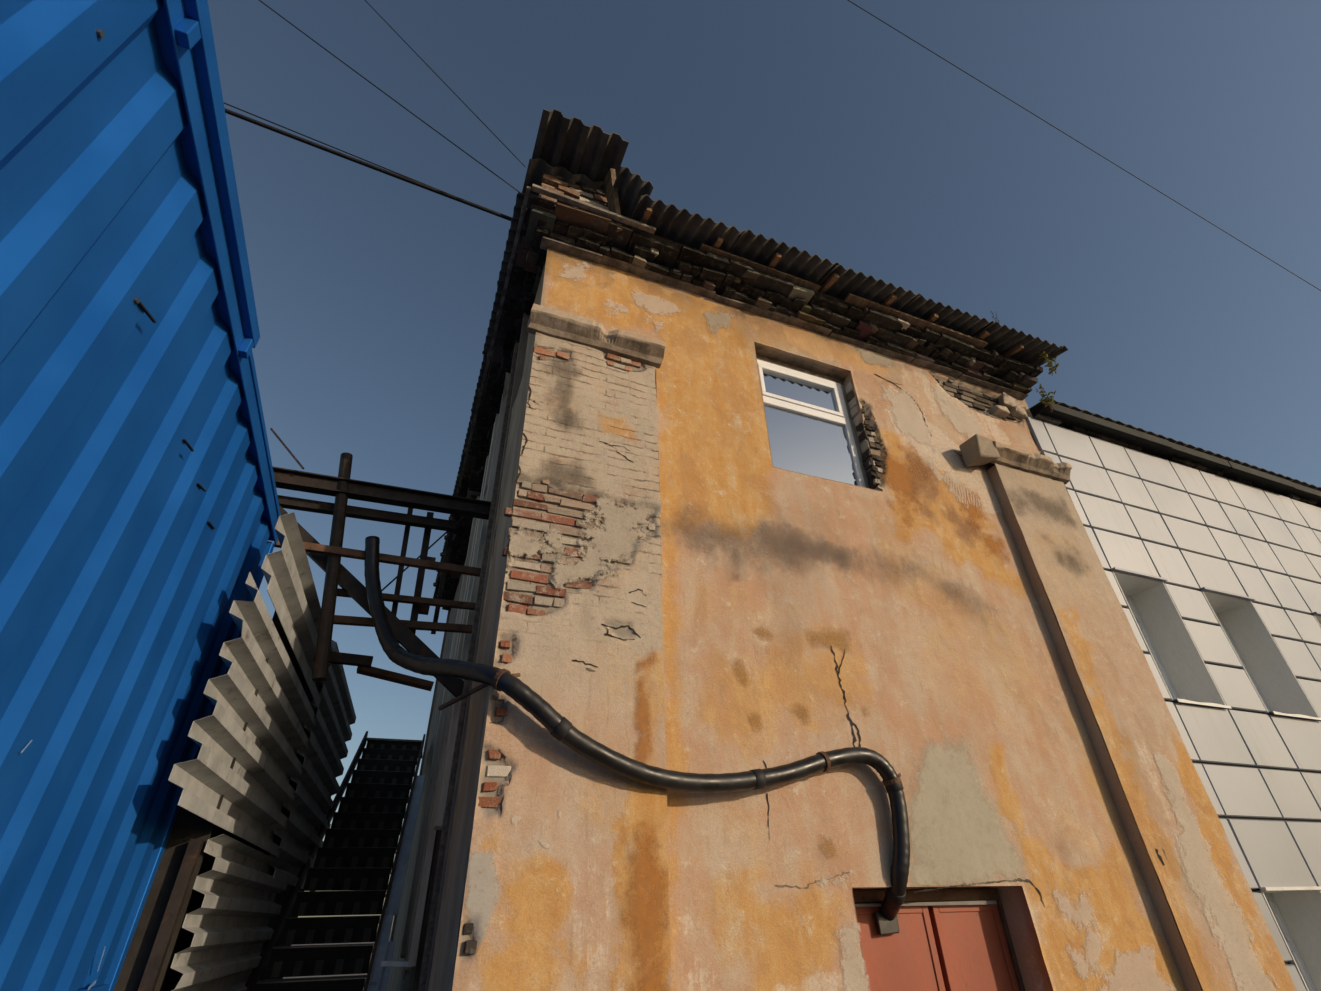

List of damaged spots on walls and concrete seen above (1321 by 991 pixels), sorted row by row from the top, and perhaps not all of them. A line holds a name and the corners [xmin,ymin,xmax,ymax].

peeling [560,262,590,281]
peeling [605,291,680,331]
spalling [533,346,572,362]
spalling [606,353,647,372]
spalling [845,382,888,489]
peeling [881,384,981,509]
spalling [929,372,1028,438]
spalling [501,479,662,618]
spalling [499,634,516,664]
crack [812,633,861,747]
spalling [475,749,520,824]
peeling [1053,888,1177,991]